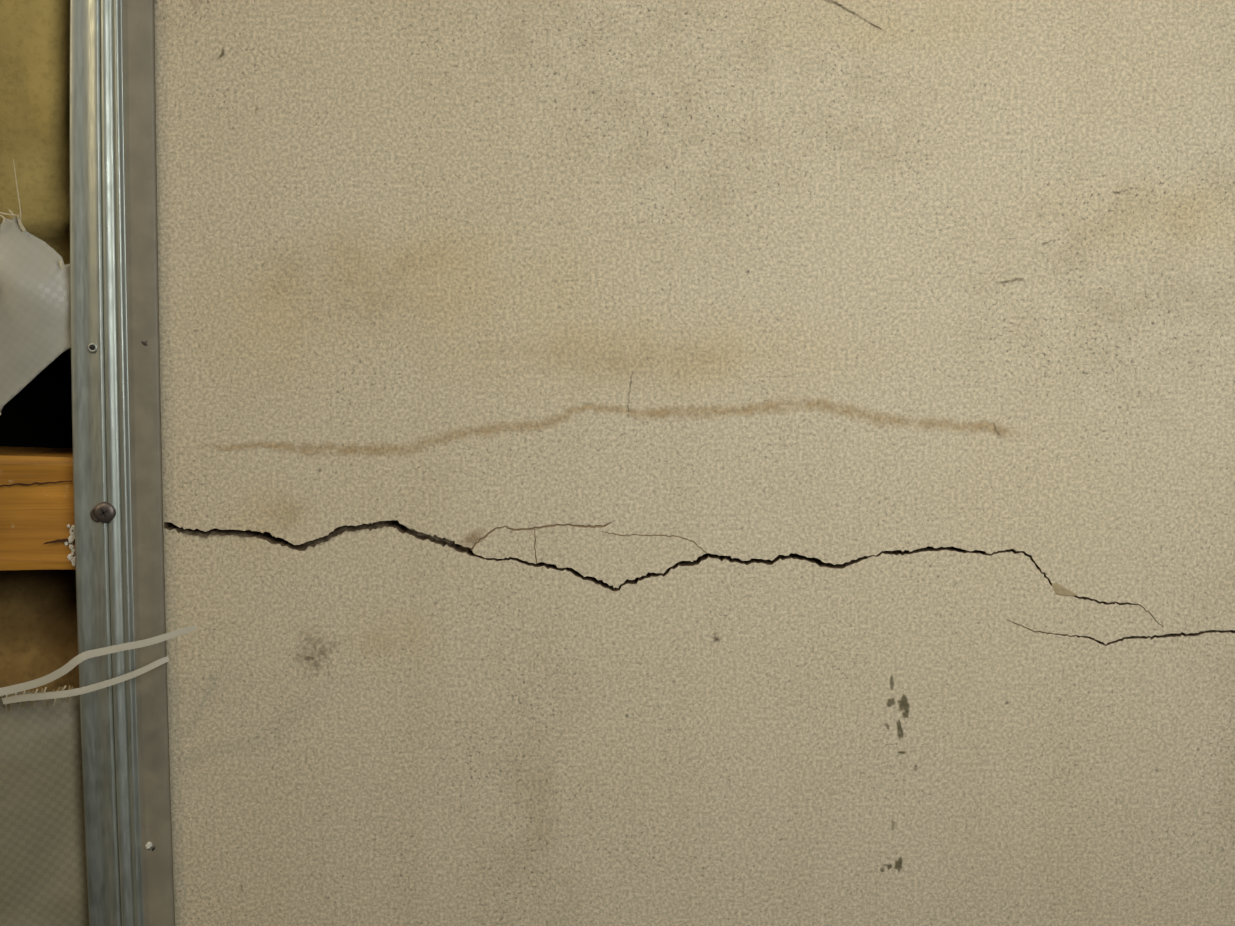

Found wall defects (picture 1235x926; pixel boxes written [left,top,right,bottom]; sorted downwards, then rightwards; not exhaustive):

crack [164,520,1235,646]